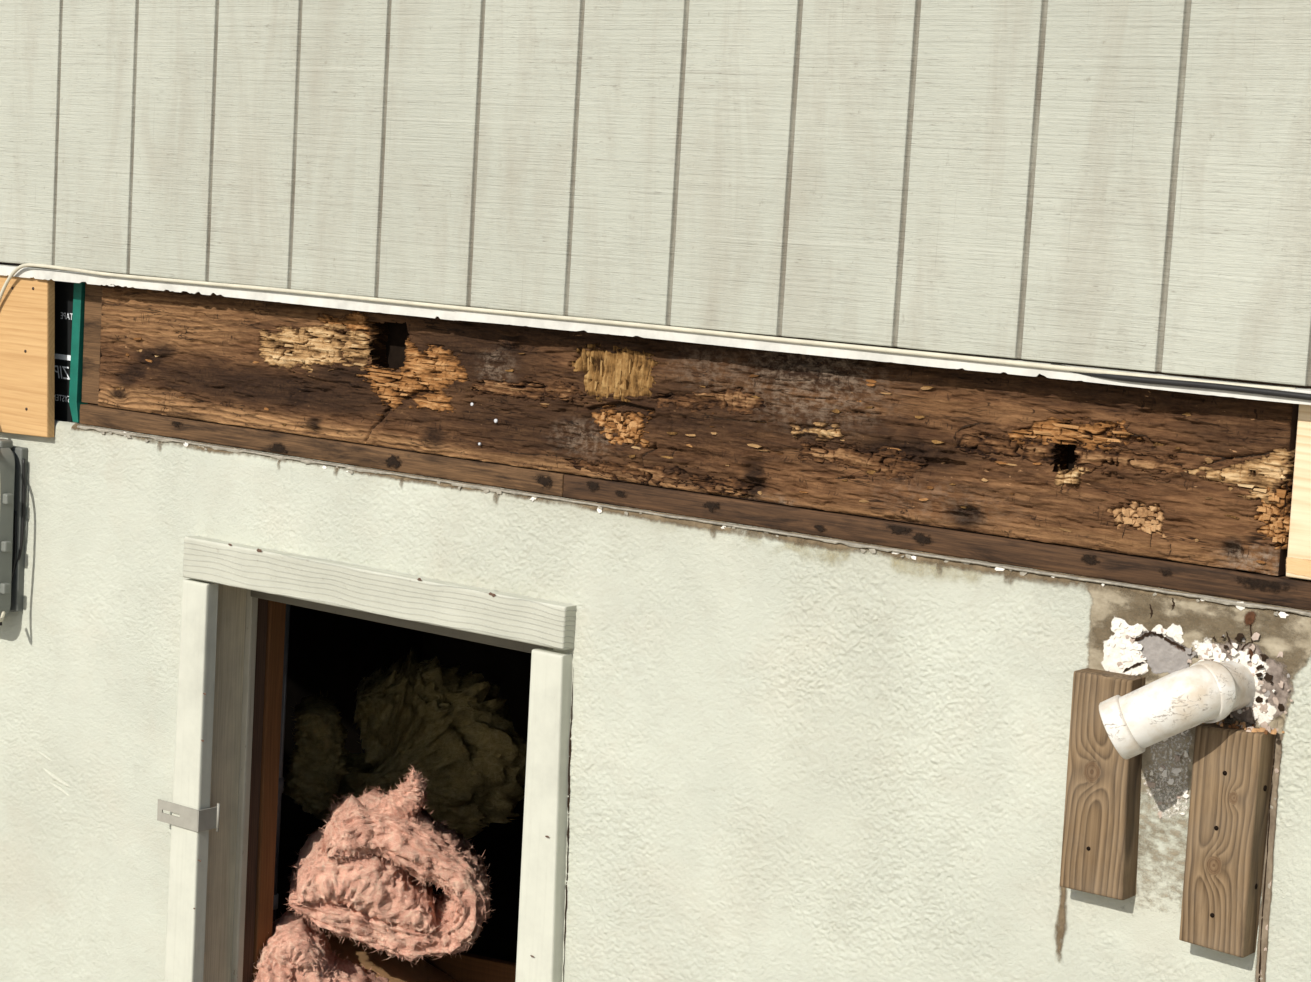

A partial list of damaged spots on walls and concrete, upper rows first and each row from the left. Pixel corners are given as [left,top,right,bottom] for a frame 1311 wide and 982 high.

leakage [71,421,1311,616]
peeling [77,425,1311,735]
peeling [1137,726,1196,897]
leakage [1055,886,1066,956]